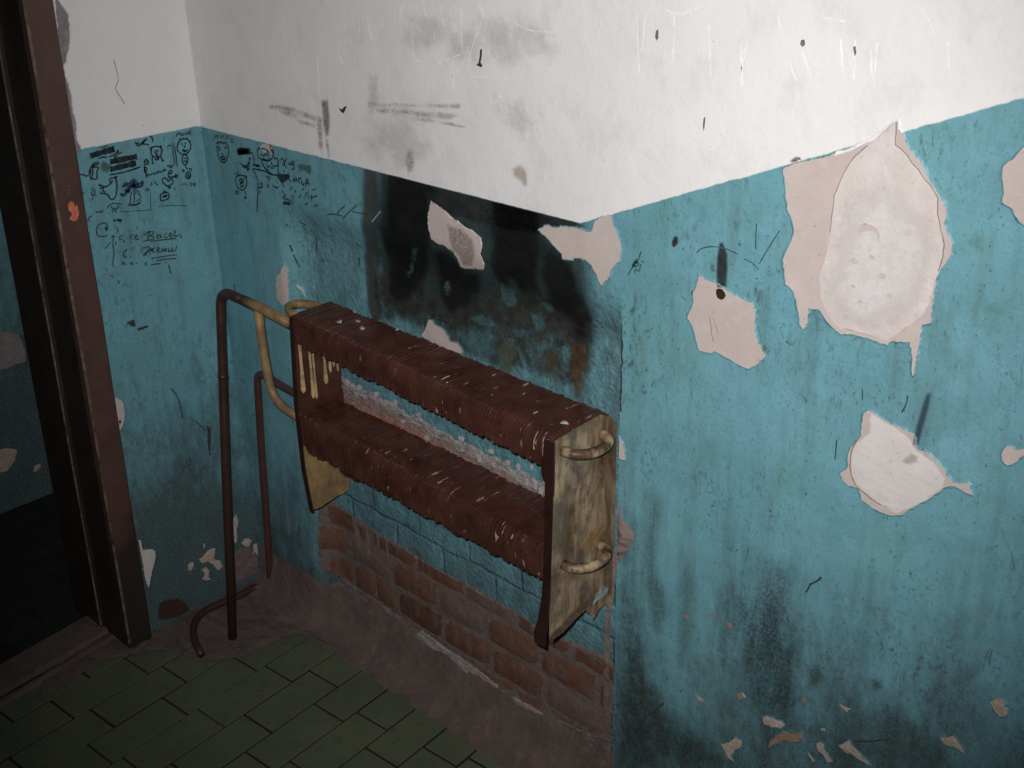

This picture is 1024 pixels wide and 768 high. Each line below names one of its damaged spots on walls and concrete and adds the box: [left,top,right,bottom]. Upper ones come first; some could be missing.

peeling [999,145,1024,227]
peeling [427,200,485,270]
peeling [538,213,624,287]
peeling [781,118,955,379]
peeling [421,319,464,355]
peeling [686,273,767,371]
peeling [838,408,975,517]
peeling [1000,444,1024,466]
peeling [188,514,259,582]
flaking render [318,501,617,758]
spalling [720,736,743,762]
spalling [761,715,872,766]